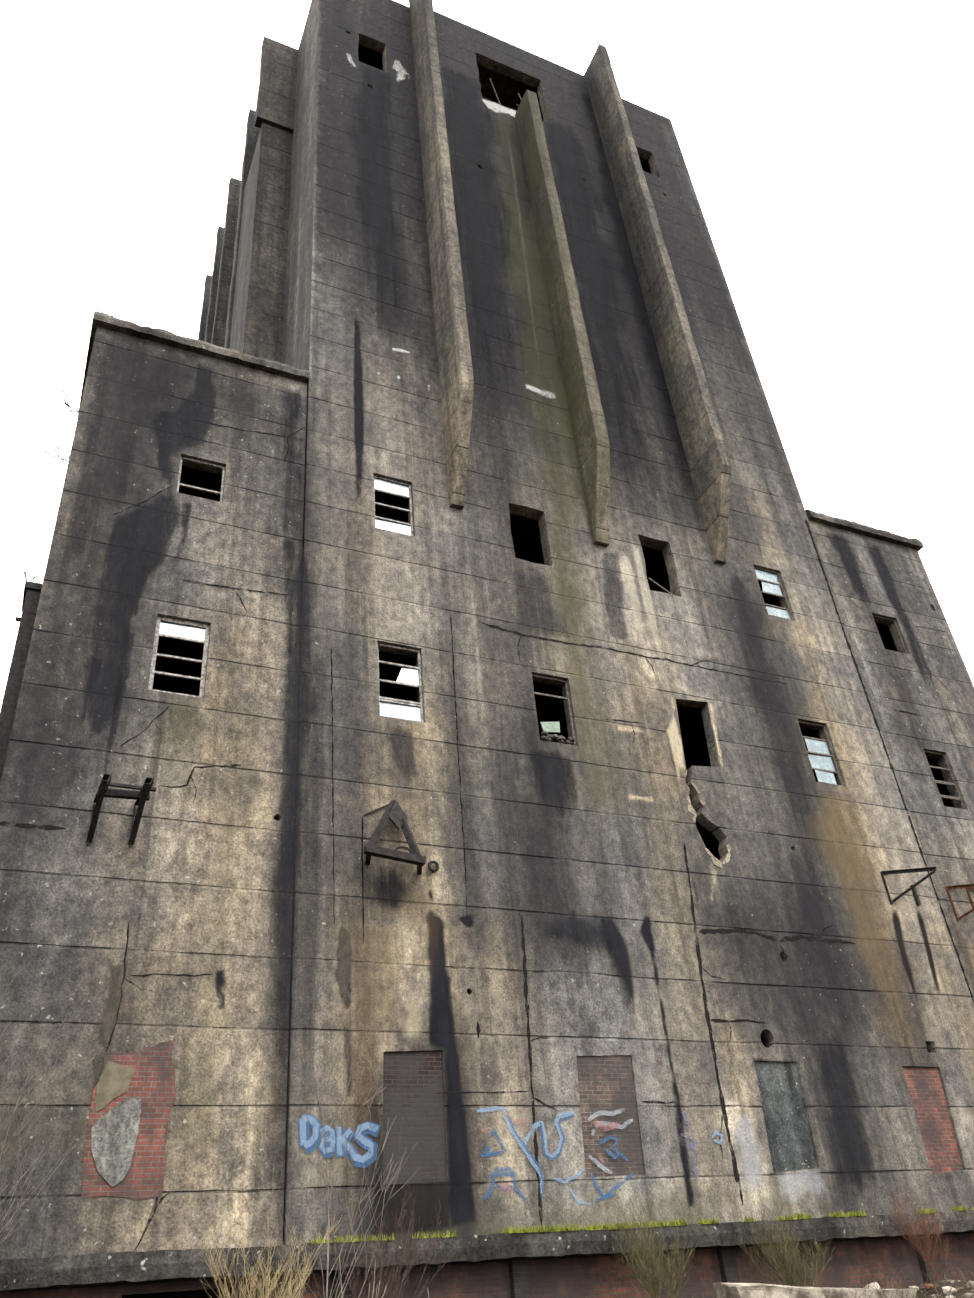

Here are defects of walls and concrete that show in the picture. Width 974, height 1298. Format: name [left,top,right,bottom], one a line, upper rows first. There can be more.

damp [356,68,396,300]
damp [83,366,215,748]
damp [831,535,867,597]
damp [870,546,925,679]
crack [119,705,170,747]
crack [159,764,240,803]
crack [450,618,787,915]
peeling [704,844,731,868]
crack [683,844,856,1205]
crack [642,1098,676,1106]